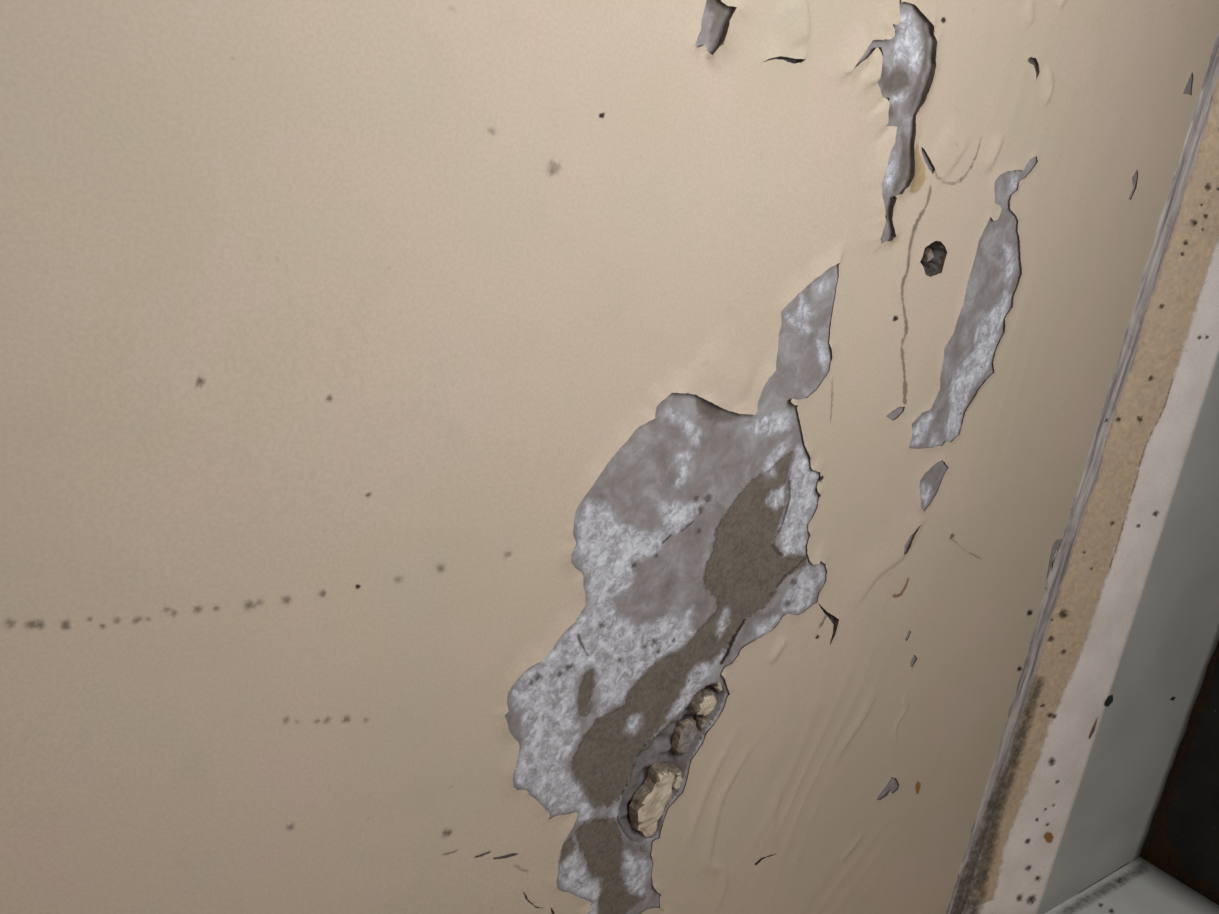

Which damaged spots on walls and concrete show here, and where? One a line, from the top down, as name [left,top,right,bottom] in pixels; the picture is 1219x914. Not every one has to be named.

peeling [688,0,742,62]
peeling [844,0,940,253]
peeling [495,254,845,914]
peeling [884,149,1040,558]
water stain [975,75,1219,905]